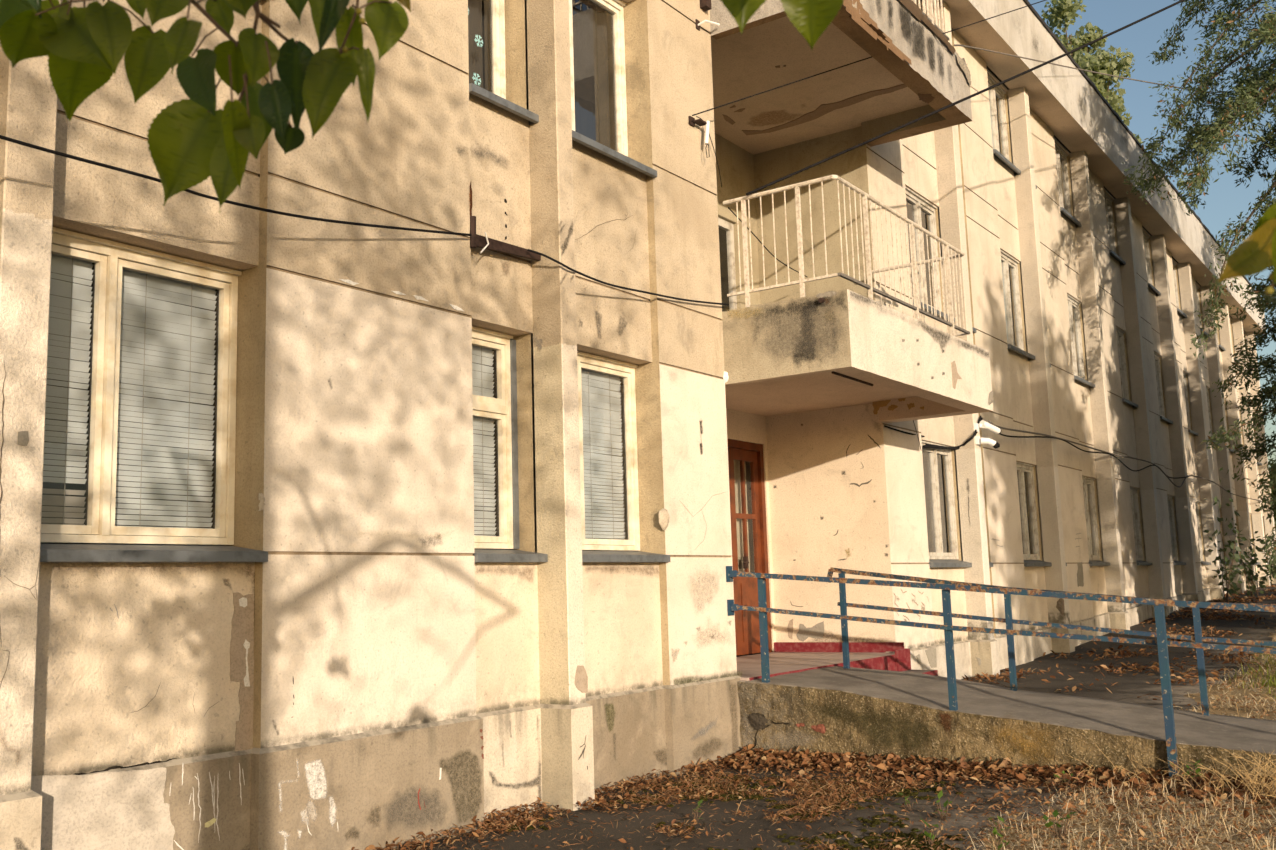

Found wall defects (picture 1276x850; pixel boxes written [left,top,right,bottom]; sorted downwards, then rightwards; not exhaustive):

damp [878,0,951,80]
damp [729,294,870,361]
peeling [872,398,924,415]
crack [0,364,8,531]
crack [6,551,41,599]
crack [0,628,10,688]
peeling [224,580,254,751]
damp [441,752,480,821]